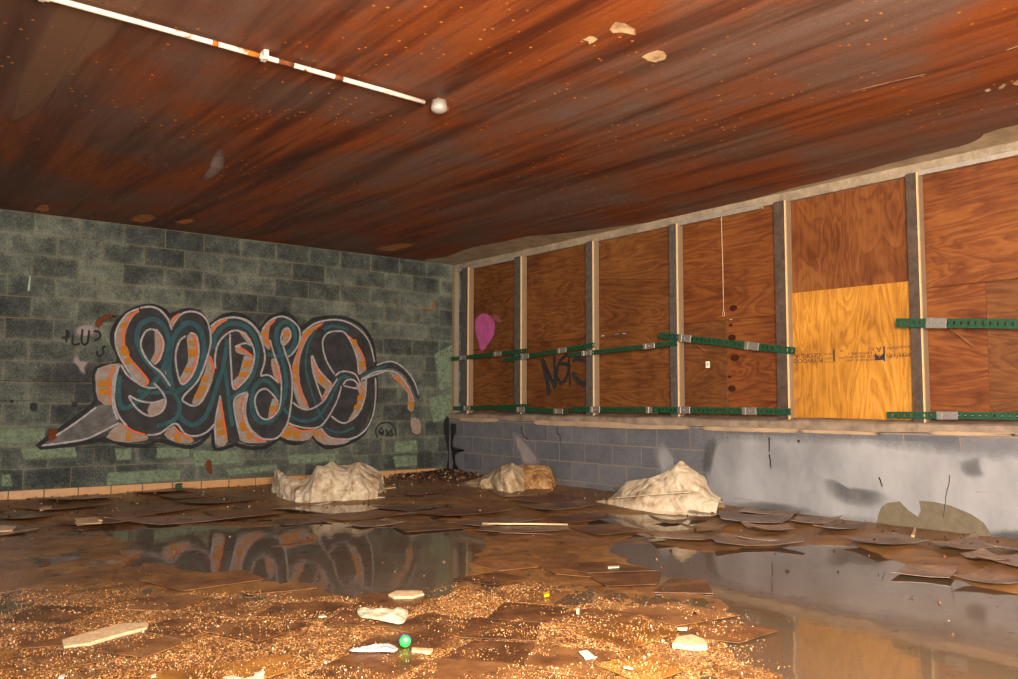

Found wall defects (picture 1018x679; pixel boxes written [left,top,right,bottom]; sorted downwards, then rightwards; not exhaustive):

peeling [610,22,636,35]
peeling [642,50,666,62]